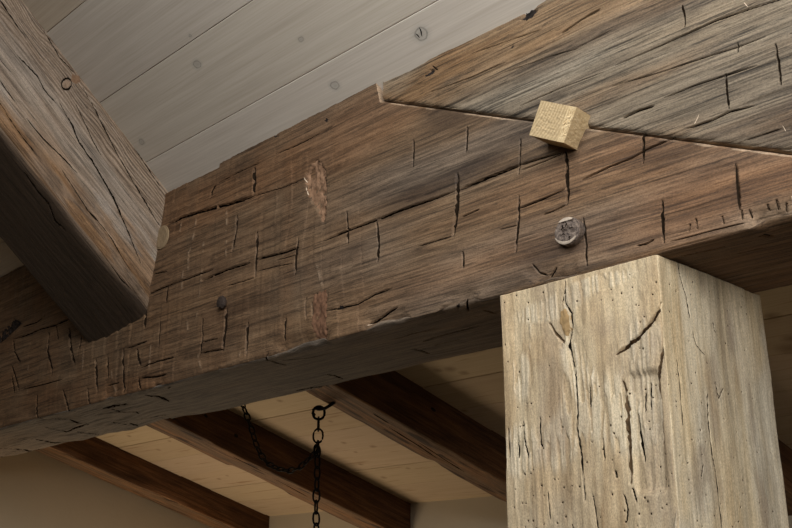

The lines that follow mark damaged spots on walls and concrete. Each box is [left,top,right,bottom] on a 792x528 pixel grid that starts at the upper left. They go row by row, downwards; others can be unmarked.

crack [0,57,304,294]
crack [324,152,573,241]
crack [583,105,756,180]
crack [639,223,744,247]
crack [533,265,599,528]
crack [603,438,637,521]